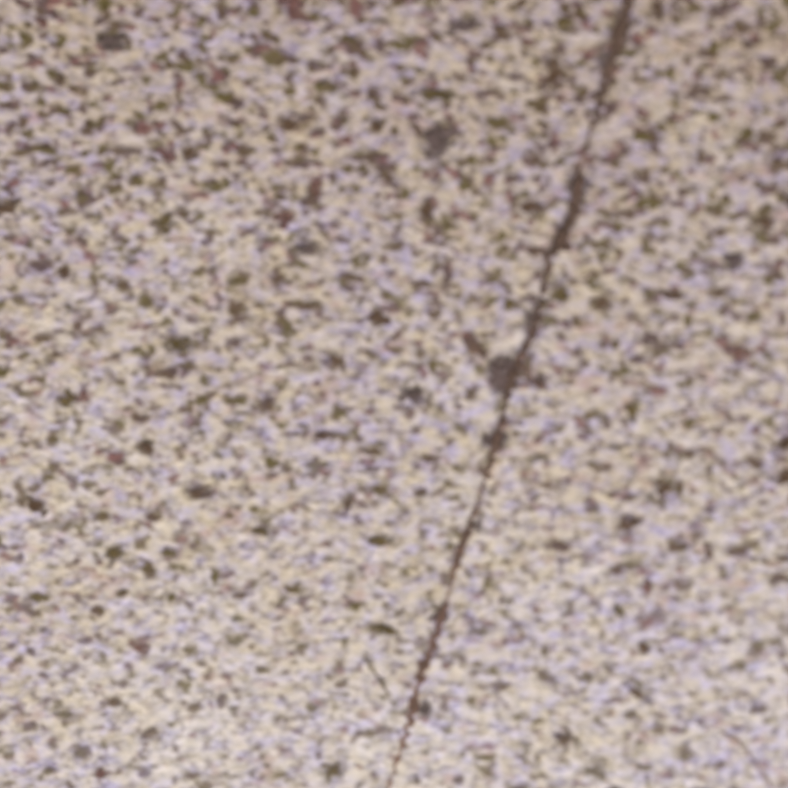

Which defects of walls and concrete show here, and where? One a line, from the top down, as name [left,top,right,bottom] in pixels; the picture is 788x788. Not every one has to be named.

crack [388,0,633,788]